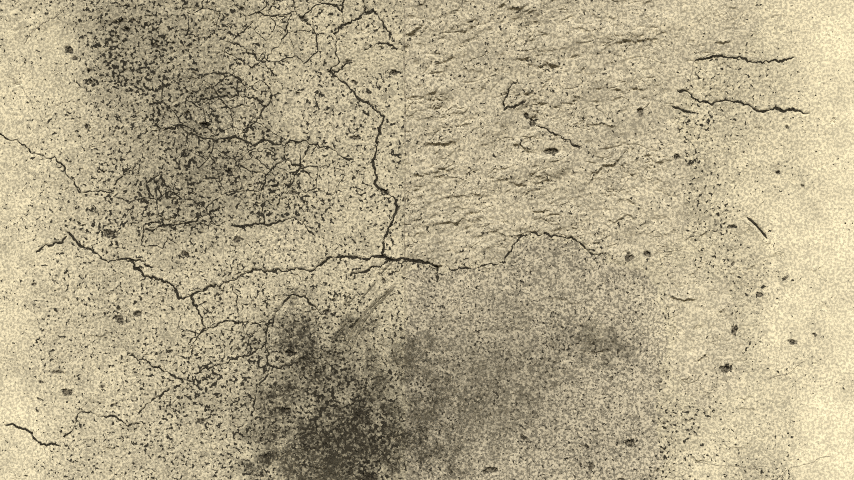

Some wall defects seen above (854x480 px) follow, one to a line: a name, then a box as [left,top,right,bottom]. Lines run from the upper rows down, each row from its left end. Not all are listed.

spalling [389,0,774,272]
crack [672,54,808,114]
crack [0,0,603,447]
damp [335,262,392,346]
damp [243,319,442,480]